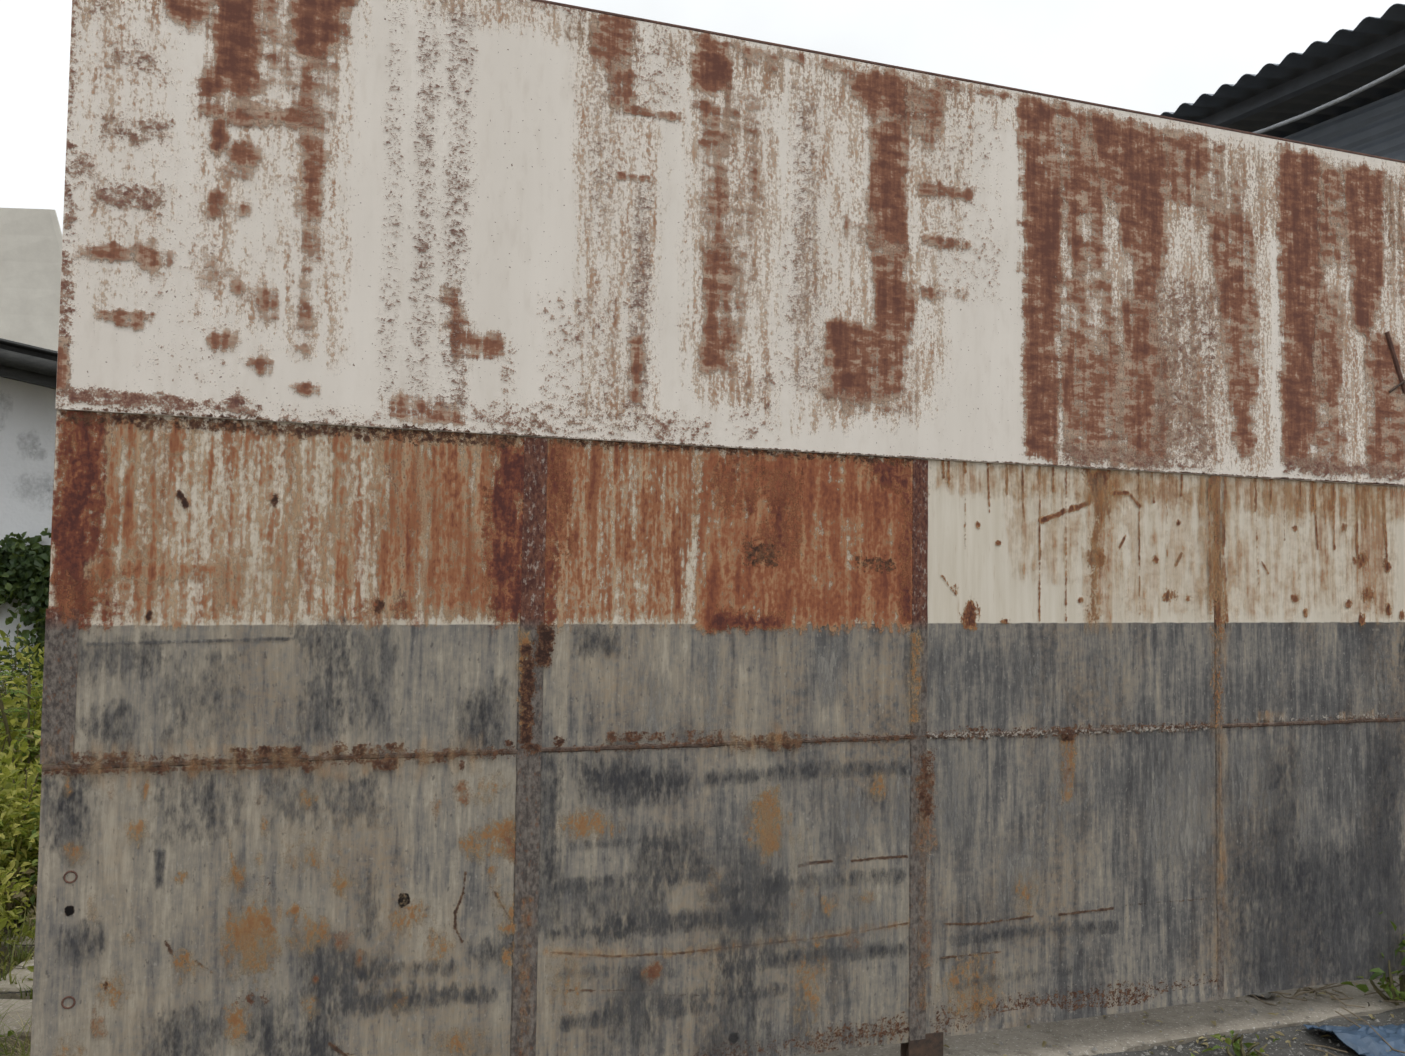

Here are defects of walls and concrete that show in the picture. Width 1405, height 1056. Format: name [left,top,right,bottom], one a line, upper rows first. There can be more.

corrosion [42,0,1405,864]
corrosion [220,852,363,1039]
corrosion [459,818,533,1055]
corrosion [698,942,1217,1056]